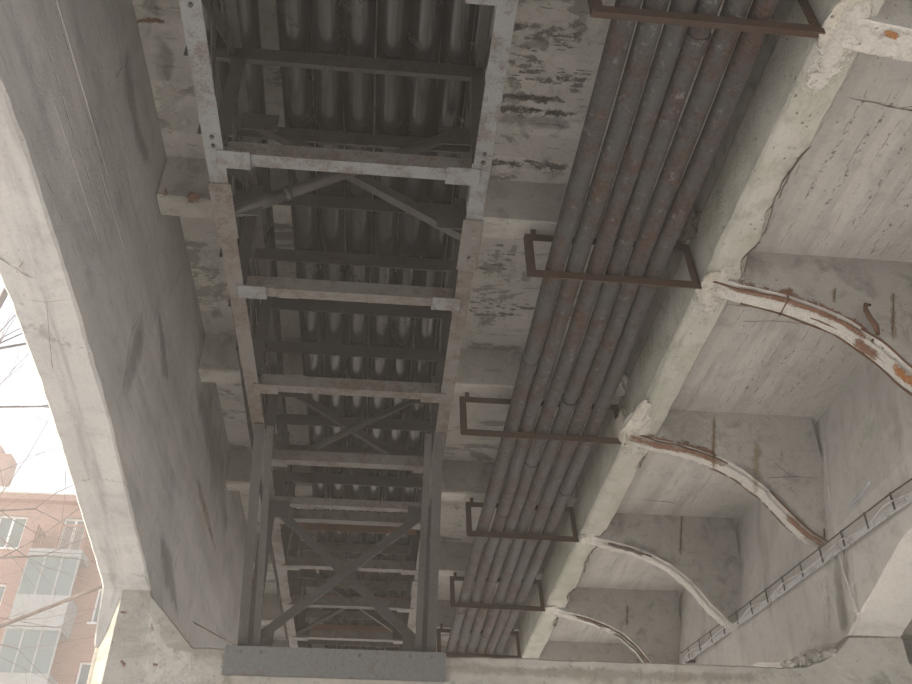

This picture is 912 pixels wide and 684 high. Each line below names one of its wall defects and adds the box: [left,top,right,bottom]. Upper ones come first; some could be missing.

spalling [840,23,912,63]
crack [807,78,912,213]
spalling [710,146,912,396]
spalling [629,417,827,546]
spalling [553,613,650,663]
spalling [582,529,727,625]